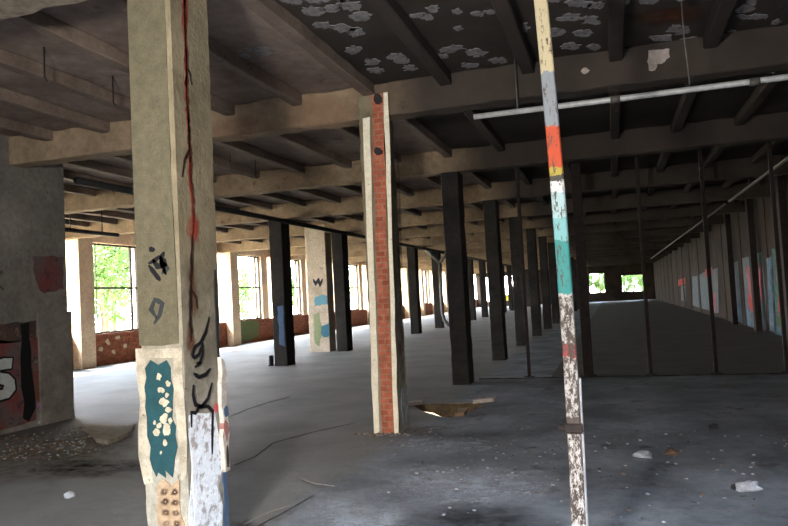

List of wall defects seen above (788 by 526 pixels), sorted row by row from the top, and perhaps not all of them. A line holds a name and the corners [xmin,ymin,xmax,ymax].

spalling [0,0,87,20]
peeling [280,0,418,74]
peeling [410,5,440,21]
peeling [438,44,507,69]
peeling [452,8,496,17]
peeling [548,0,605,51]
spalling [647,24,697,71]
peeling [735,0,782,25]
crack [181,0,198,342]